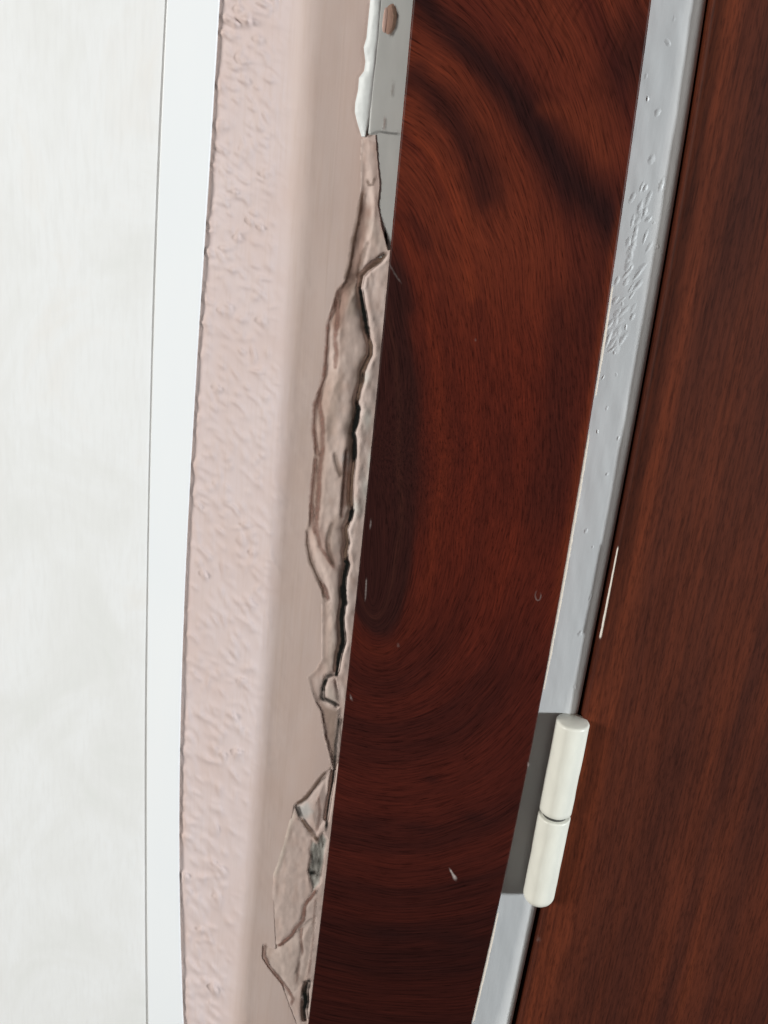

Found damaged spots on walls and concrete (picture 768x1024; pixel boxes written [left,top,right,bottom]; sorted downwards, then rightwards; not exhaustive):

spalling [262,763,338,1024]